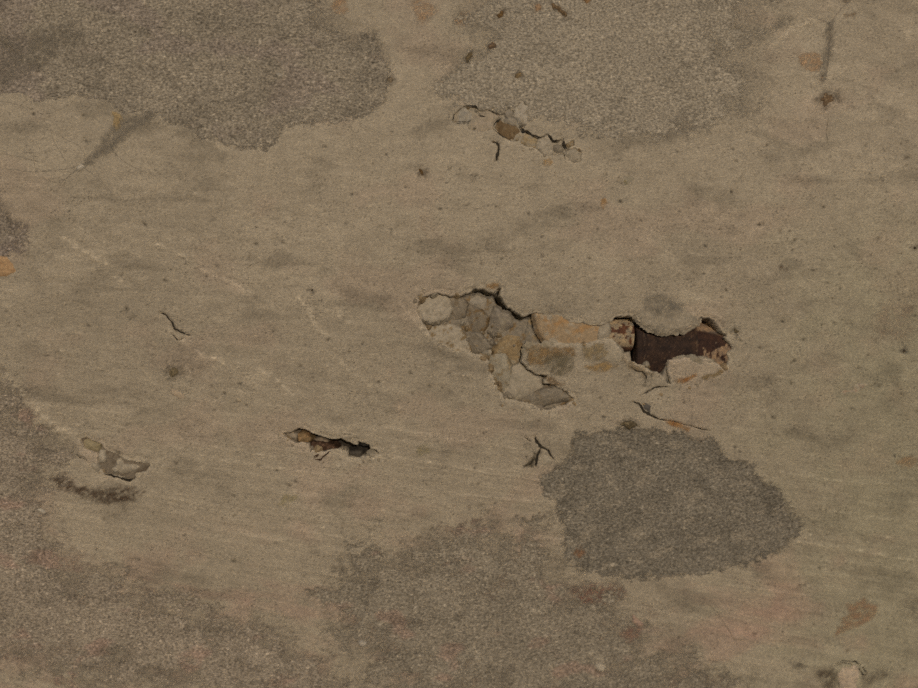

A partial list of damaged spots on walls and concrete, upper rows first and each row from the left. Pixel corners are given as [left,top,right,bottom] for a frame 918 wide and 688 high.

peeling [434,0,783,164]
crack [162,313,189,340]
spalling [413,287,650,414]
crack [524,437,555,467]
crack [632,368,707,430]
peeling [0,370,803,688]